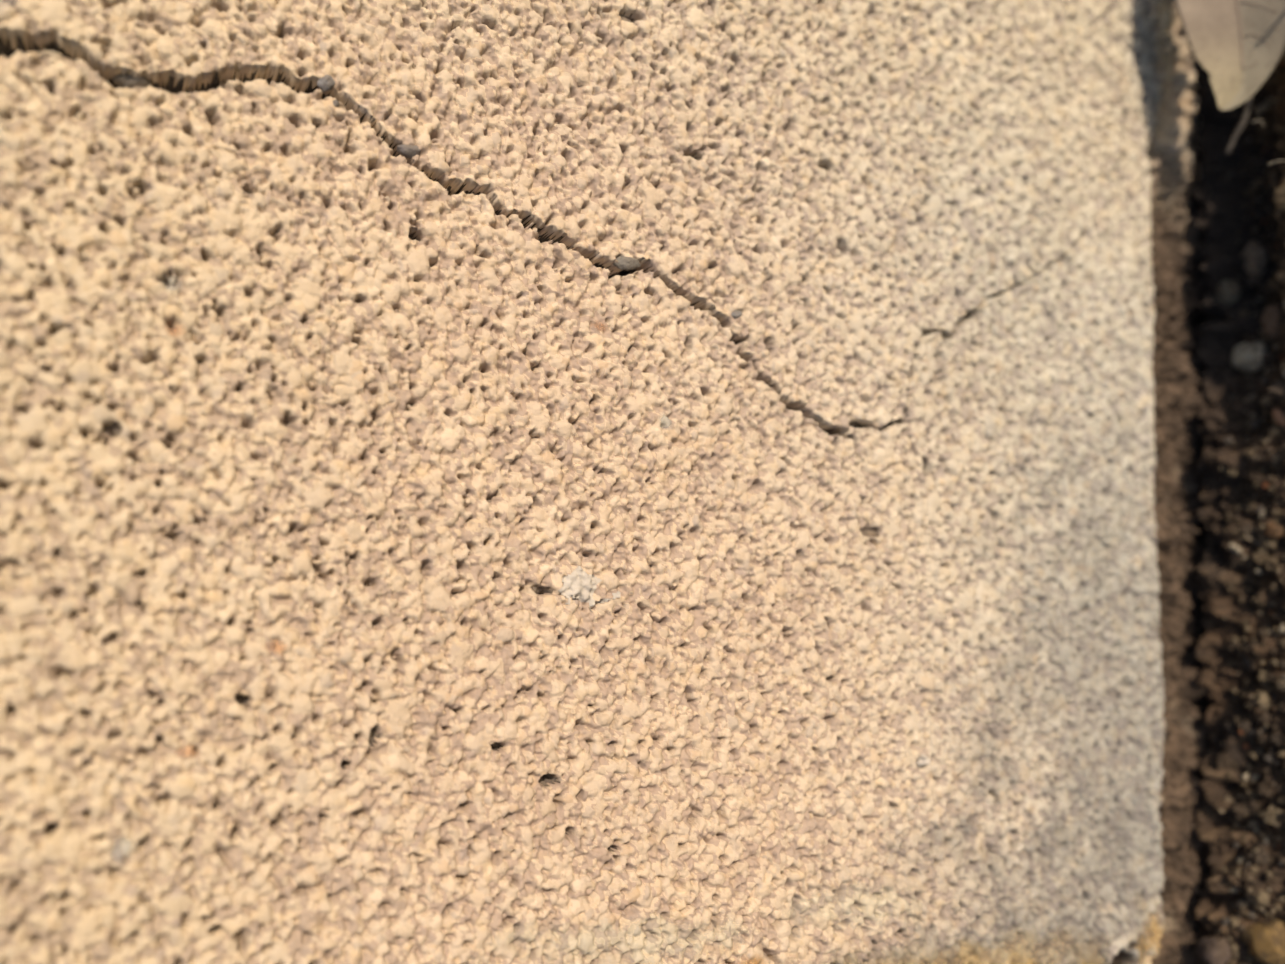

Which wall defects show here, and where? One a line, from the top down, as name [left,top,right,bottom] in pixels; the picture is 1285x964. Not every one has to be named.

crack [0,35,742,358]
crack [914,283,1015,357]
crack [766,381,909,455]